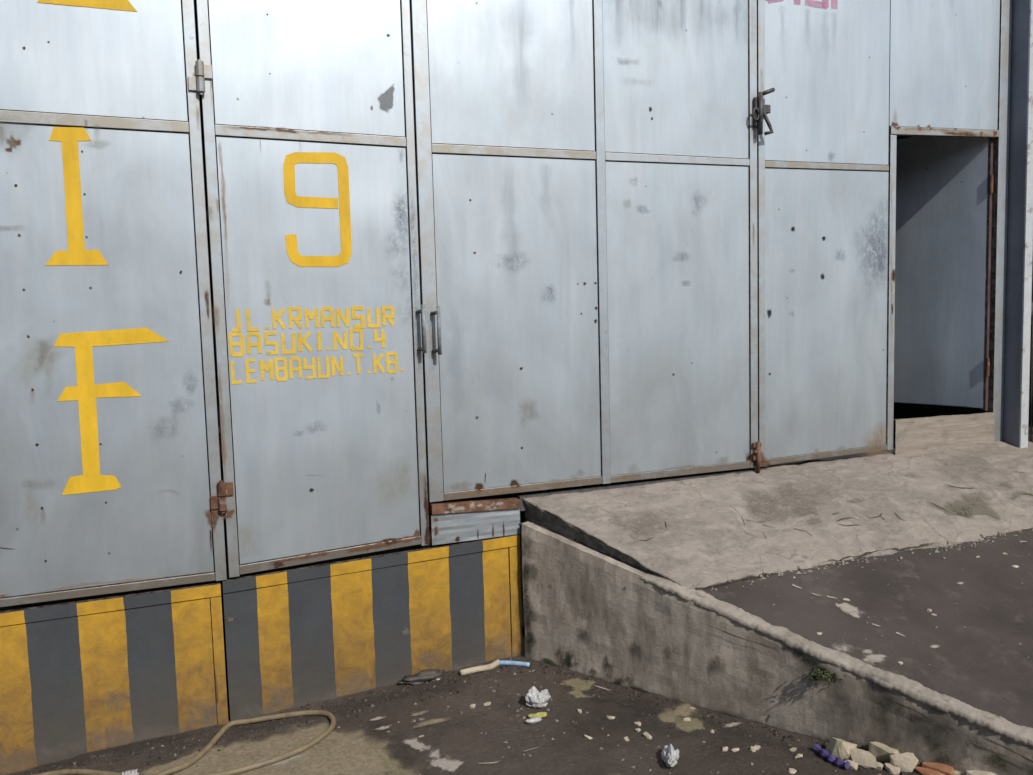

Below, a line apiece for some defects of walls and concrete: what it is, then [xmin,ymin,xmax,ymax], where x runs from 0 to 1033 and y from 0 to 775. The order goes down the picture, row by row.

damp [543,650,572,671]